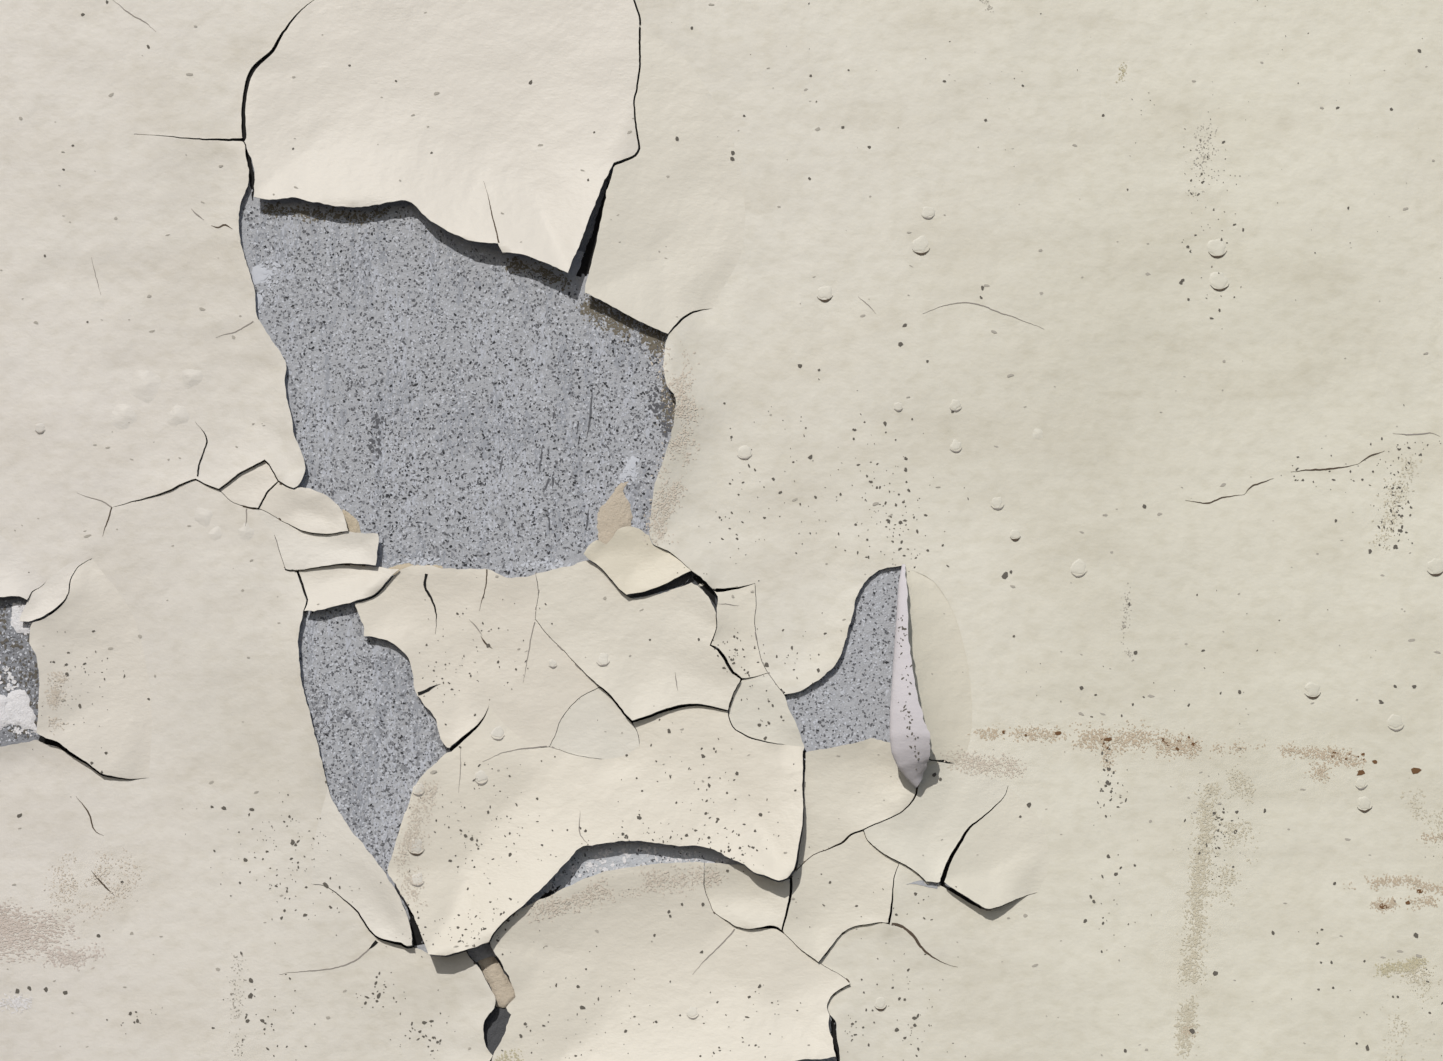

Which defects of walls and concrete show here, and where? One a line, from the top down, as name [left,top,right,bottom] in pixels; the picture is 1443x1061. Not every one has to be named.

peeling [101,0,1049,1061]
crack [1185,432,1439,504]
peeling [0,535,152,779]
water stain [1093,748,1128,826]
water stain [1174,748,1266,1059]